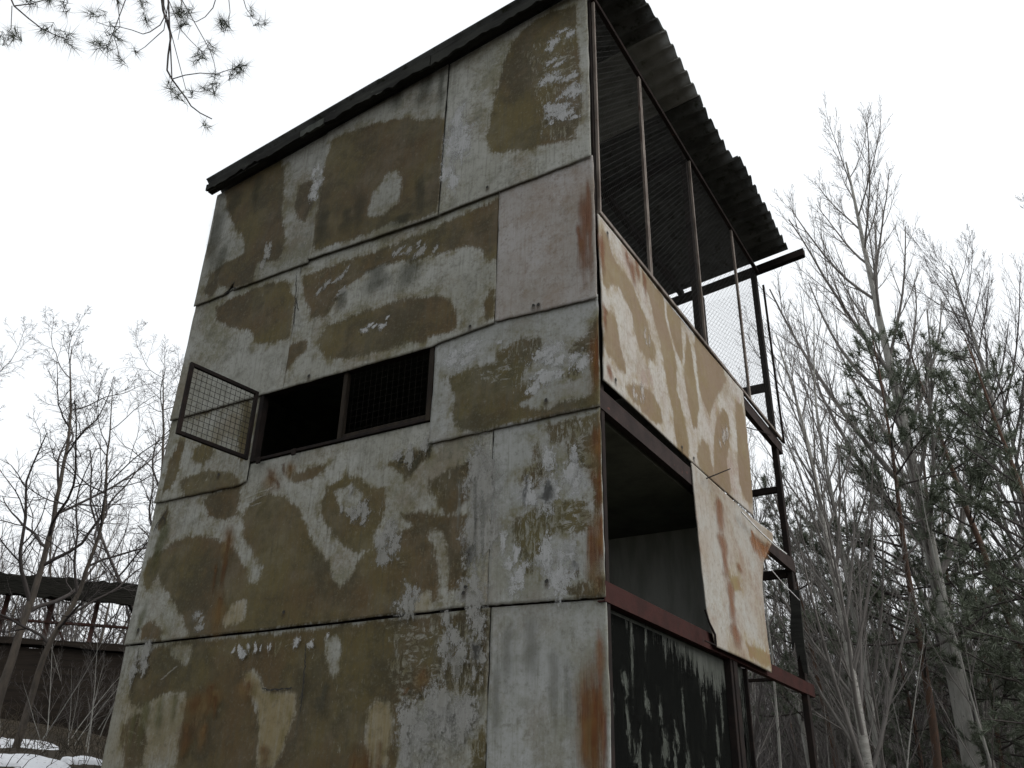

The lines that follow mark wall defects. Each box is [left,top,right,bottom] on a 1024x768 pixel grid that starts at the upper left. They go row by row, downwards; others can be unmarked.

peeling [534,28,586,127]
rust [577,186,604,267]
peeling [231,642,272,660]
peeling [391,430,590,768]
rust [579,639,606,768]
peeling [613,620,724,768]
rust [717,499,741,643]